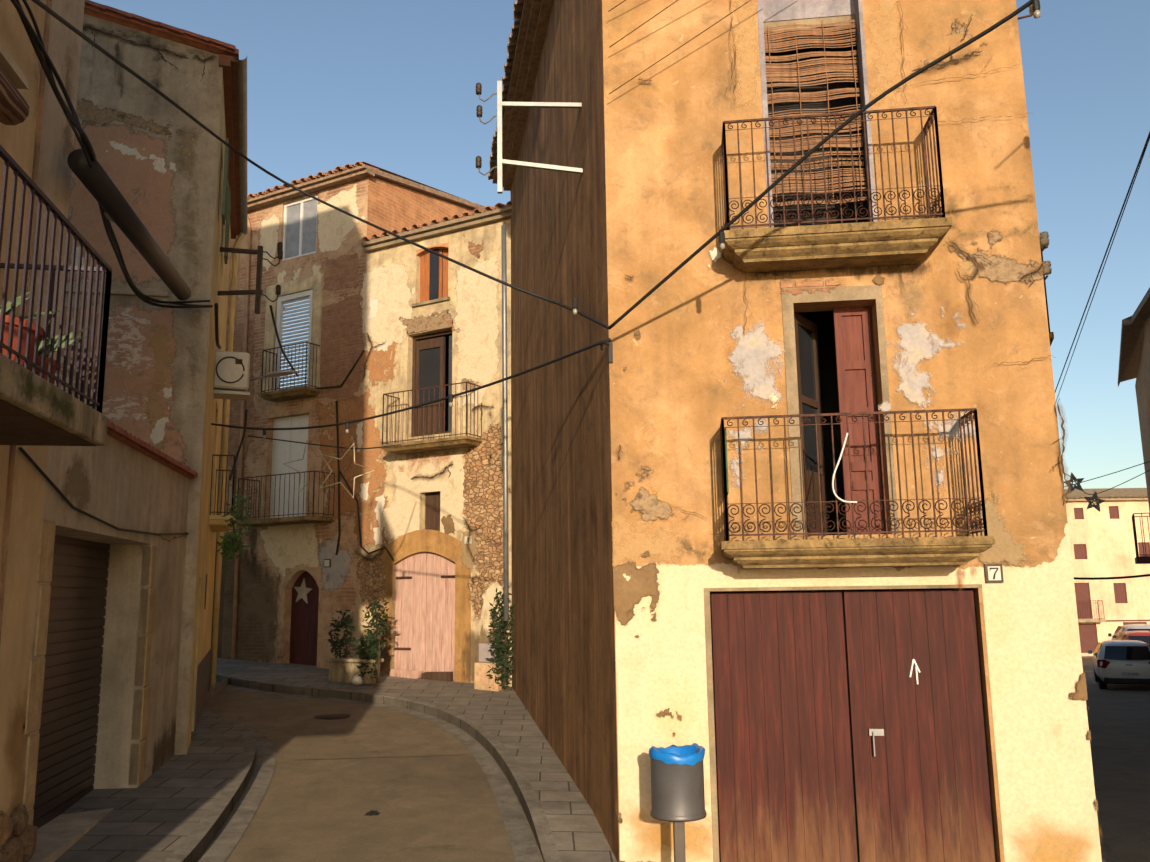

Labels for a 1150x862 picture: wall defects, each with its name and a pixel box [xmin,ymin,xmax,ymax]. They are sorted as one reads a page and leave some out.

crack [724,0,737,105]
crack [897,2,1015,103]
peeling [106,141,177,174]
crack [948,238,998,323]
crack [1022,261,1046,286]
flaking render [220,319,258,468]
peeling [728,322,785,487]
peeling [886,313,976,486]
crack [1053,398,1070,504]
flaking render [259,423,512,638]
peeling [612,466,683,638]
leakage [1031,834,1085,862]